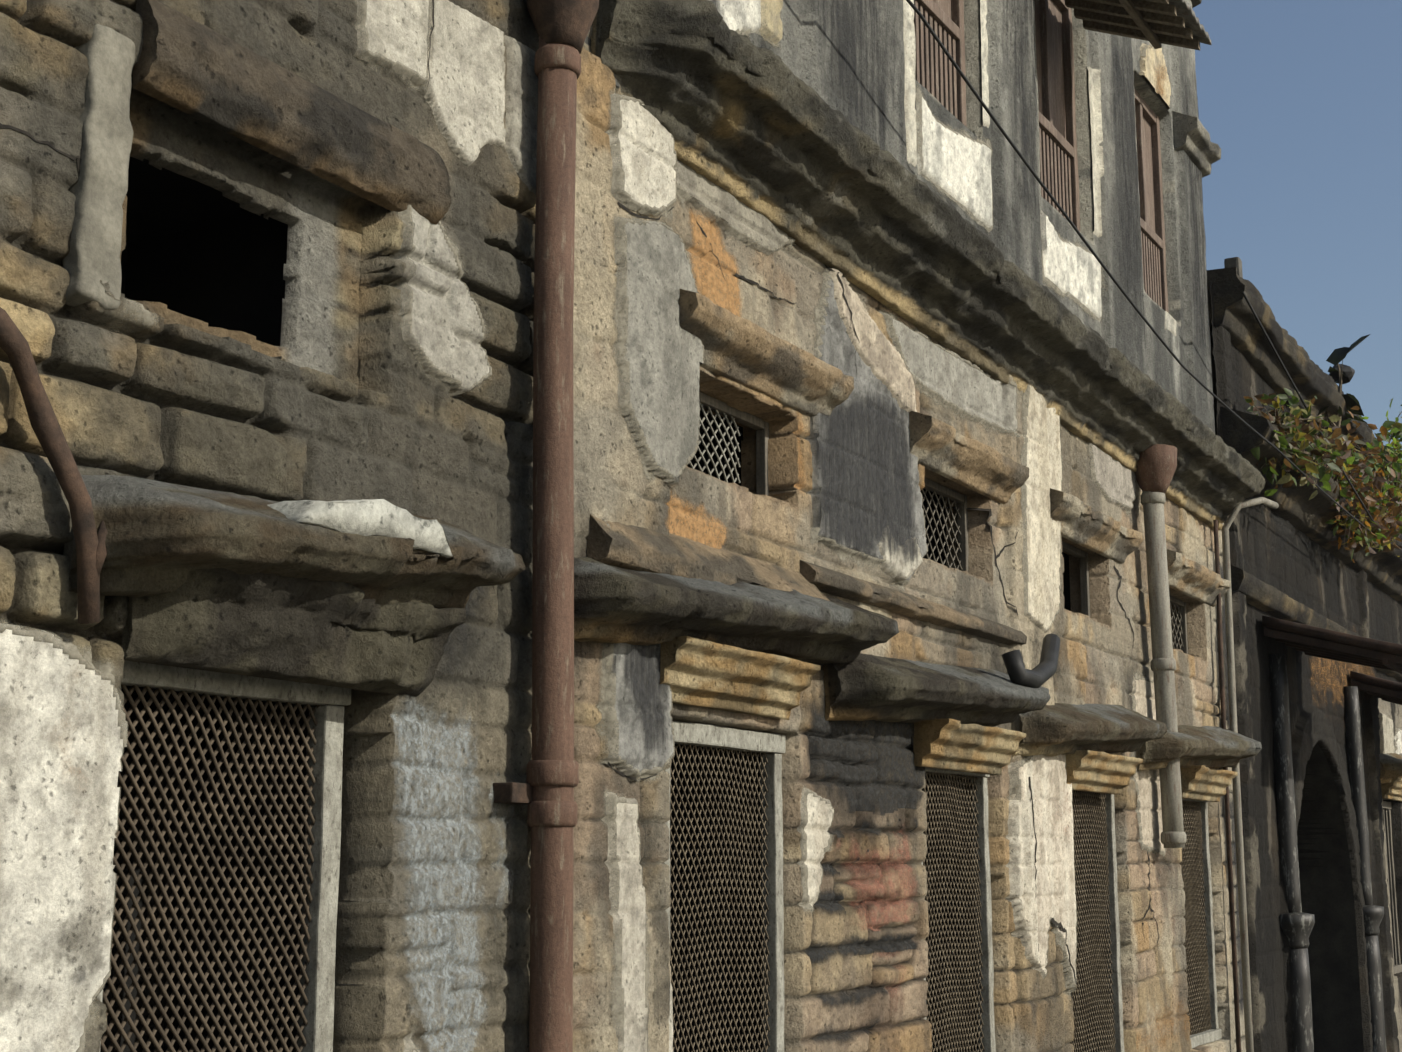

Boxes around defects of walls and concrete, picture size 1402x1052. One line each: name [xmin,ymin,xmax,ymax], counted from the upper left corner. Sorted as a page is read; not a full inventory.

leakage [823,0,894,143]
leakage [1007,0,1037,215]
leakage [816,394,918,562]
flaking render [1005,754,1077,996]